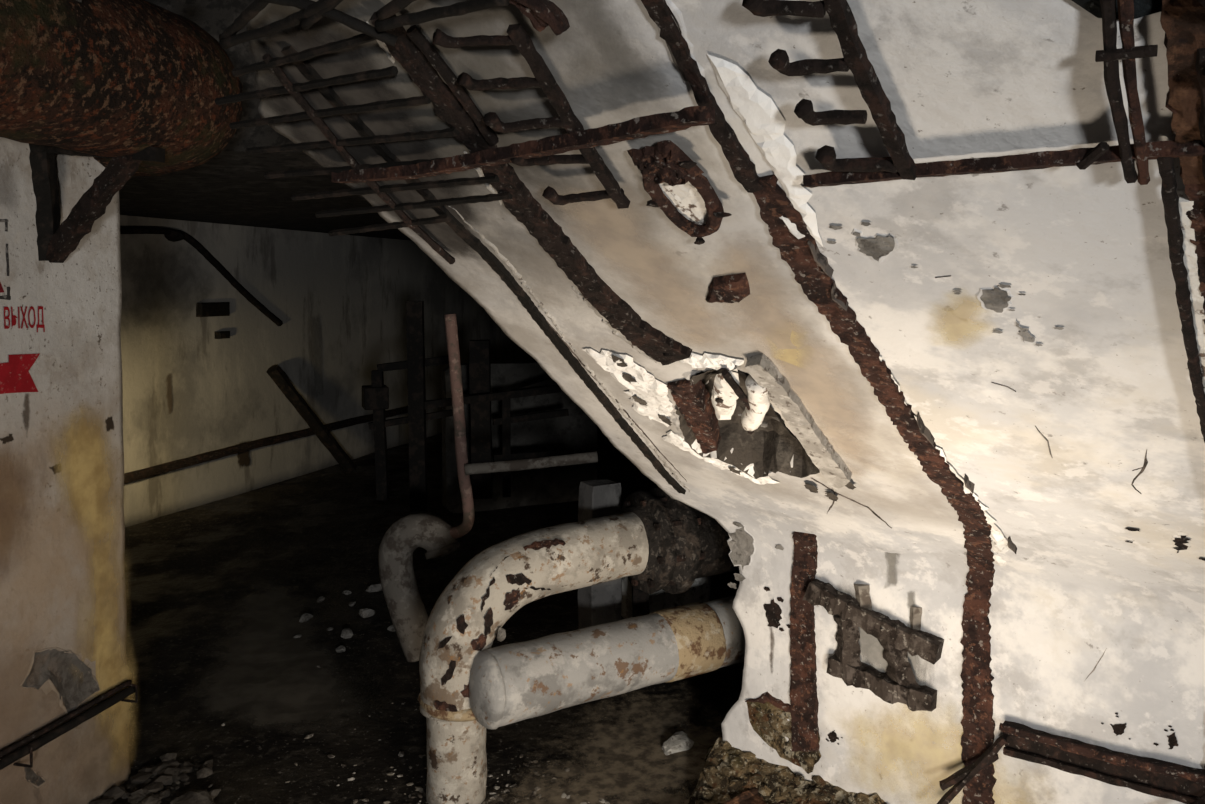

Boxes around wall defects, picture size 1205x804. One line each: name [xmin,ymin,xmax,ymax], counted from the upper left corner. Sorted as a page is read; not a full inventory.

peeling [657,0,899,311]
spalling [214,0,856,501]
spalling [952,284,1043,346]
corrosion [667,379,721,454]
peeling [891,375,1017,566]
spalling [727,522,756,589]
spalling [1171,533,1205,561]
spalling [763,587,790,631]
spalling [858,627,888,673]
spalling [745,692,843,774]
spalling [1101,713,1131,740]
spalling [1154,725,1178,749]